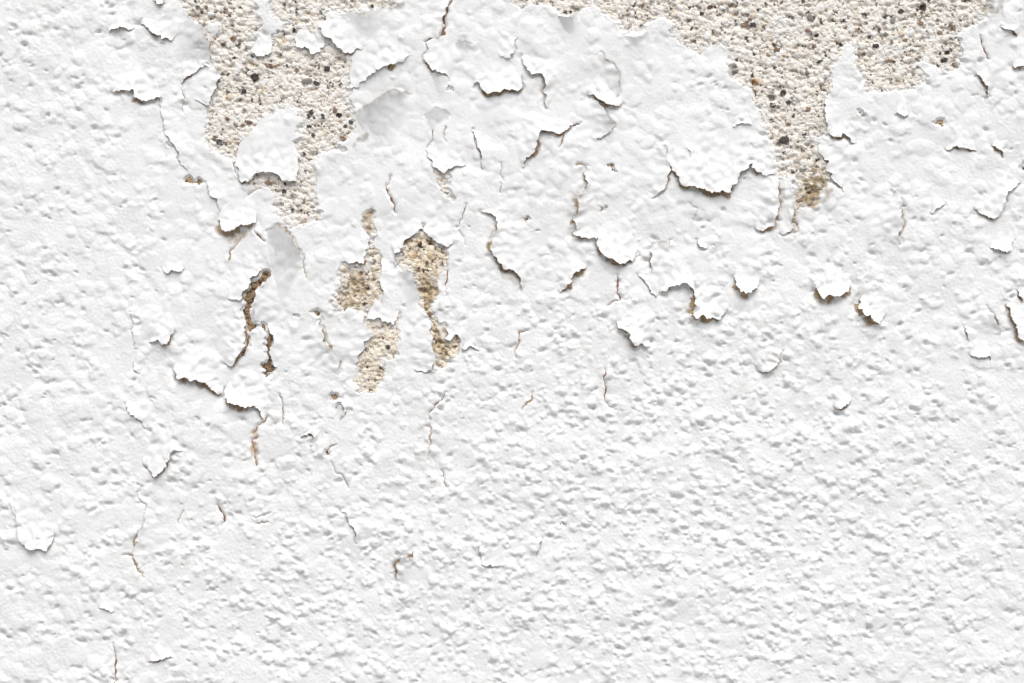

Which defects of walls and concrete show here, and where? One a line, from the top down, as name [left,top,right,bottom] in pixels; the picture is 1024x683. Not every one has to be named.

peeling [473,30,622,167]
peeling [511,0,992,234]
peeling [108,0,479,420]
peeling [482,207,539,290]
peeling [557,247,586,292]
peeling [570,163,759,347]
peeling [814,266,889,326]
peeling [963,290,1024,359]
peeling [973,140,1024,253]
crack [428,394,446,486]
peeling [9,479,54,551]
crack [126,497,183,577]